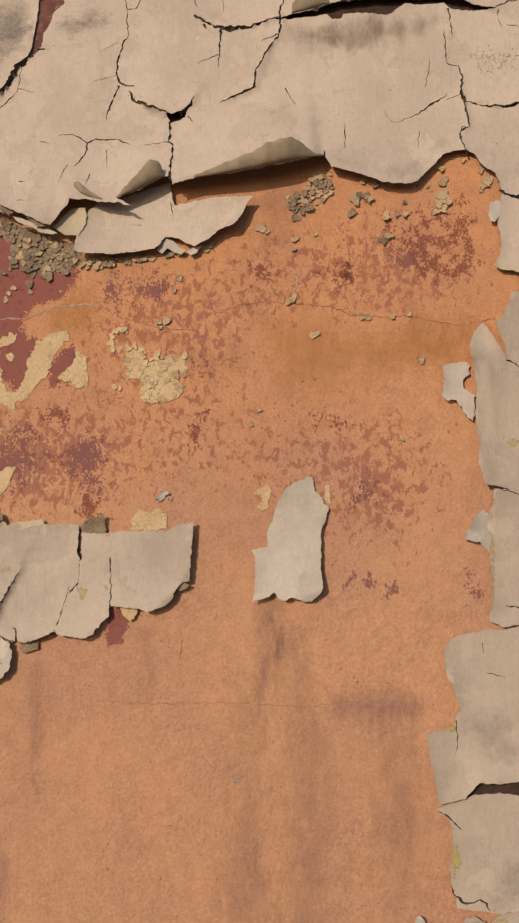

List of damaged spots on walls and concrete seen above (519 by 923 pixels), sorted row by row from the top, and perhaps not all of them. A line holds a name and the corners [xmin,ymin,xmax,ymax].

crack [0,0,65,108]
crack [40,0,194,182]
peeling [292,0,342,13]
crack [194,0,519,156]
peeling [233,259,280,291]
peeling [193,137,324,178]
peeling [283,169,334,222]
peeling [319,179,379,298]
peeling [376,166,519,296]
peeling [0,399,194,679]
peeling [252,476,329,602]
peeling [341,569,399,600]